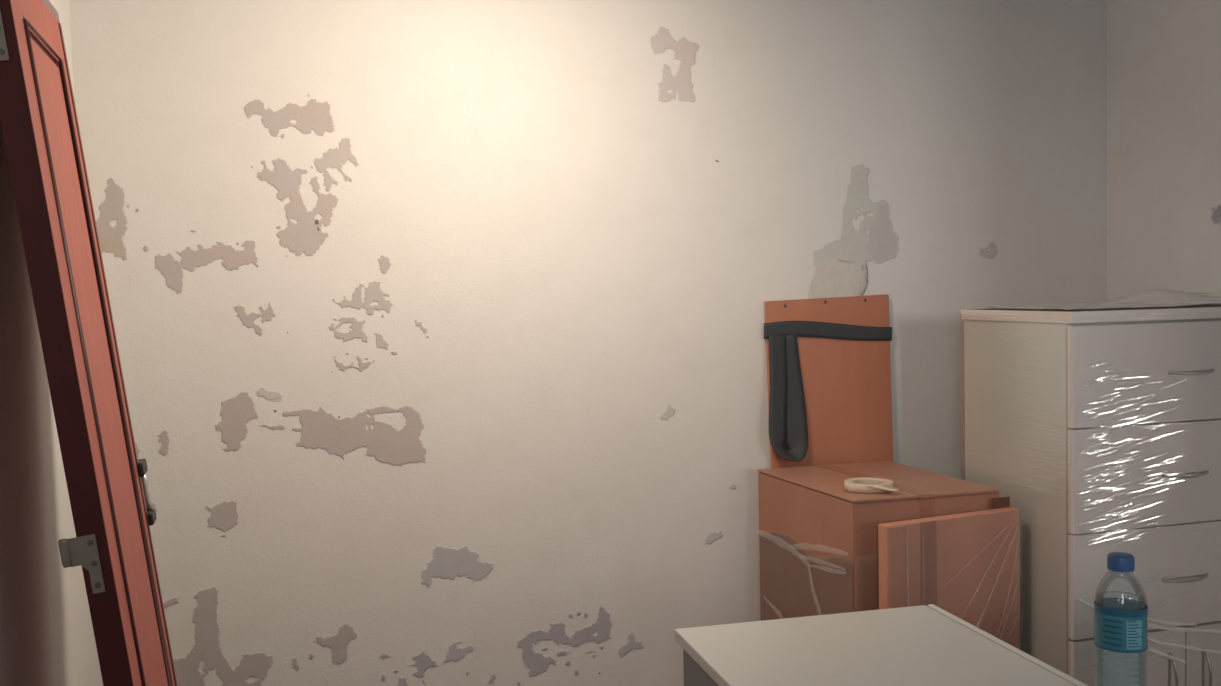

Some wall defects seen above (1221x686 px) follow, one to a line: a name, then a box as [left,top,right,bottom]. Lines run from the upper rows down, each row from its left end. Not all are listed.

peeling [650,27,700,102]
peeling [244,93,360,257]
peeling [96,177,140,261]
peeling [813,163,899,271]
peeling [143,230,259,294]
peeling [328,255,398,372]
peeling [215,386,427,466]
peeling [205,500,240,537]
peeling [420,545,494,588]
peeling [163,586,275,686]
peeling [290,622,357,671]
peeling [517,605,645,685]